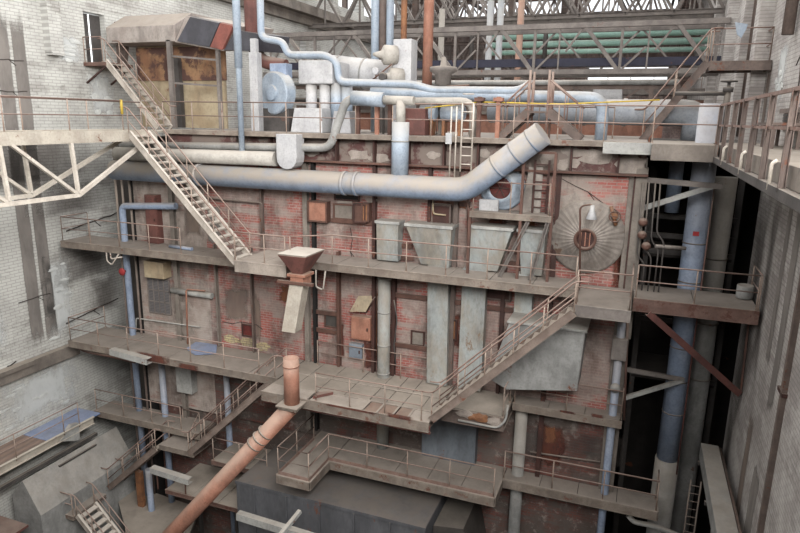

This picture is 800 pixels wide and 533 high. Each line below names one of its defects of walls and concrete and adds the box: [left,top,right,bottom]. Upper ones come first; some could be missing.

rust [136,46,227,81]
flaking render [348,150,390,163]
rust [534,424,566,466]